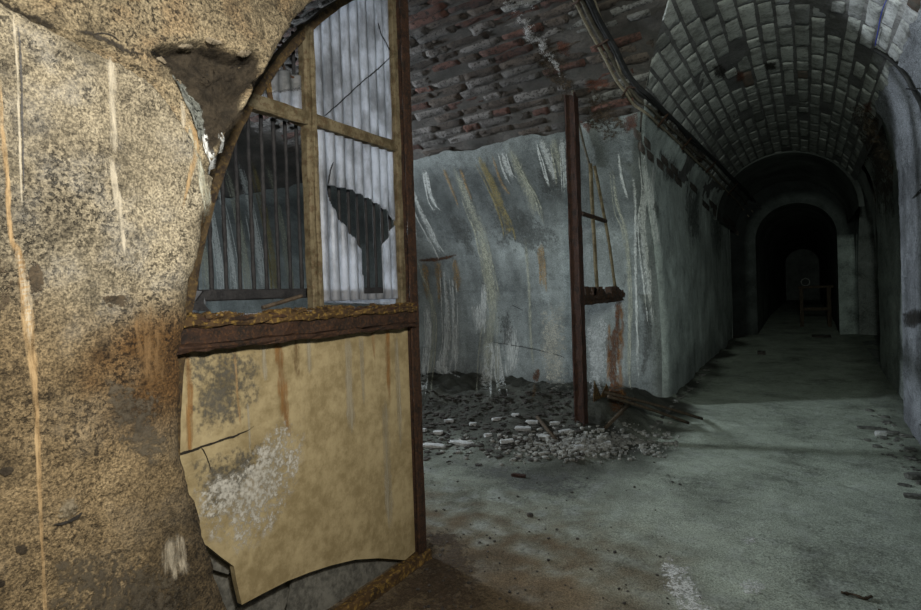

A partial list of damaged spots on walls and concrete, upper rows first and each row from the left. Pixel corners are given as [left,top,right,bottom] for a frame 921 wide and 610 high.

crack [0,0,55,29]
crack [80,31,142,54]
leakage [503,0,565,77]
spalling [151,37,261,154]
leakage [537,142,567,199]
leakage [414,172,443,257]
leakage [190,345,266,423]
leakage [421,278,458,394]
leakage [481,313,518,392]
corrosion [607,302,626,412]
crack [180,429,250,469]
leakage [195,428,301,546]